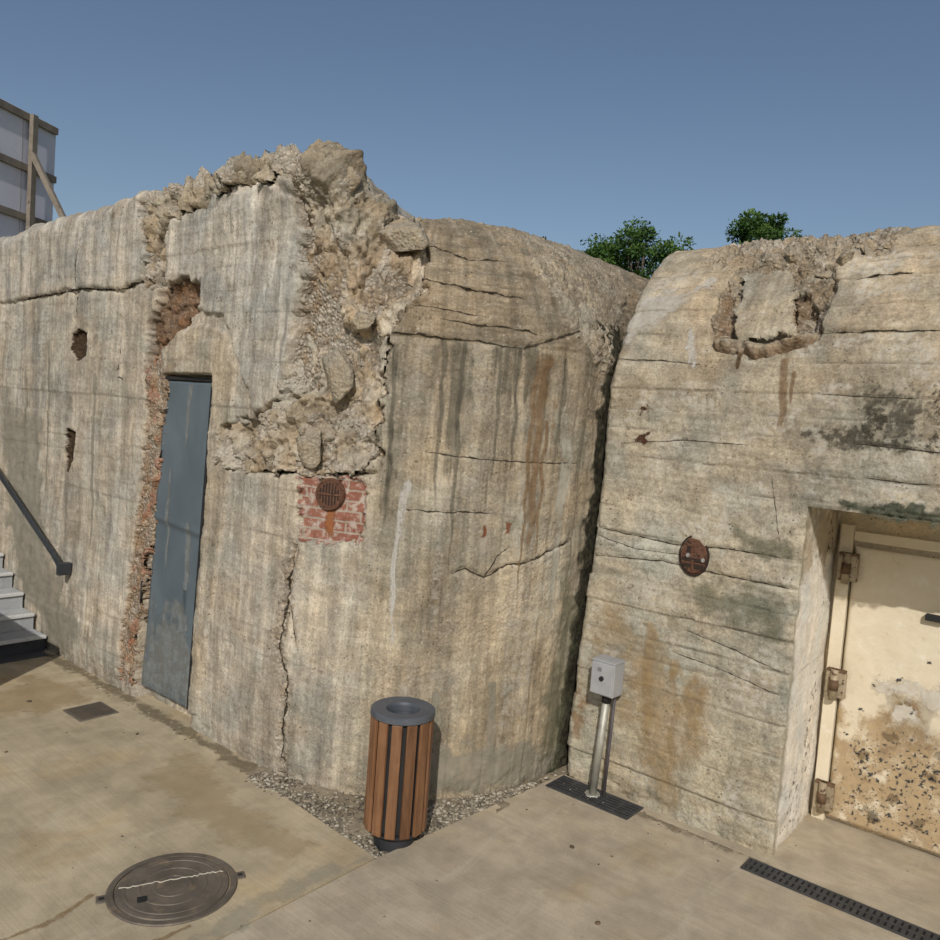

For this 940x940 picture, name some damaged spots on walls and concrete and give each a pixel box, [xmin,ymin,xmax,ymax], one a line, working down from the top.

crack [389,278,580,349]
spalling [710,244,874,360]
spalling [118,139,430,688]
mould [801,385,940,455]
crack [451,539,571,578]
damp [429,277,717,792]
crack [597,527,683,566]
crack [705,481,794,590]
damp [879,502,925,518]
crack [279,549,297,768]
crack [677,629,778,695]
peeling [830,702,940,848]